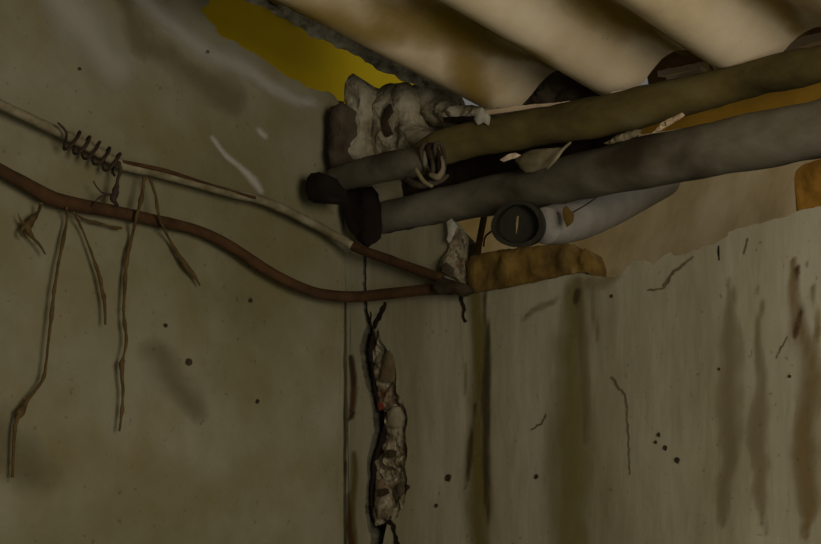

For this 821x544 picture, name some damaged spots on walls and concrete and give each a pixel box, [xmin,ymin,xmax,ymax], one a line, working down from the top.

crack [647,256,694,291]
crack [360,256,400,544]
spalling [373,328,410,526]
crack [610,376,631,475]
corrosion [791,259,820,531]